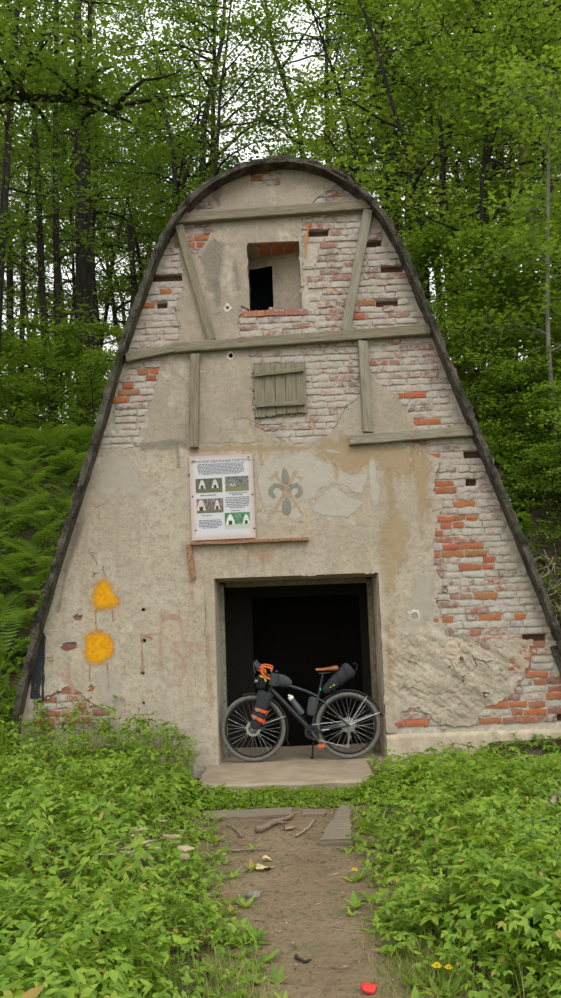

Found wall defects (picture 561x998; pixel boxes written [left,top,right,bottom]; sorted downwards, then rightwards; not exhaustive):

flaking render [314,185,357,203]
flaking render [101,198,216,450]
leakage [320,437,428,584]
flaking render [224,212,561,729]
flaking render [19,683,112,732]